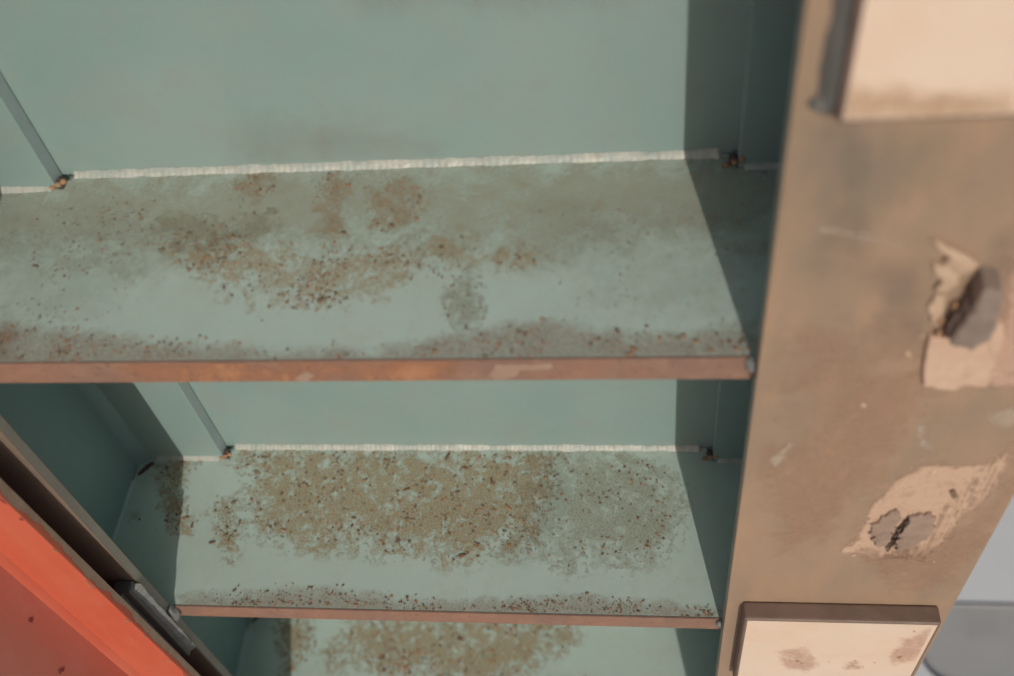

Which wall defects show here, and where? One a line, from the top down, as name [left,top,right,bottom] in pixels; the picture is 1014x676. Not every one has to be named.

corrosion [0,172,757,382]
peeling [909,237,1014,391]
corrosion [154,460,201,535]
corrosion [208,449,684,571]
peeling [840,442,1014,563]
corrosion [204,583,662,676]